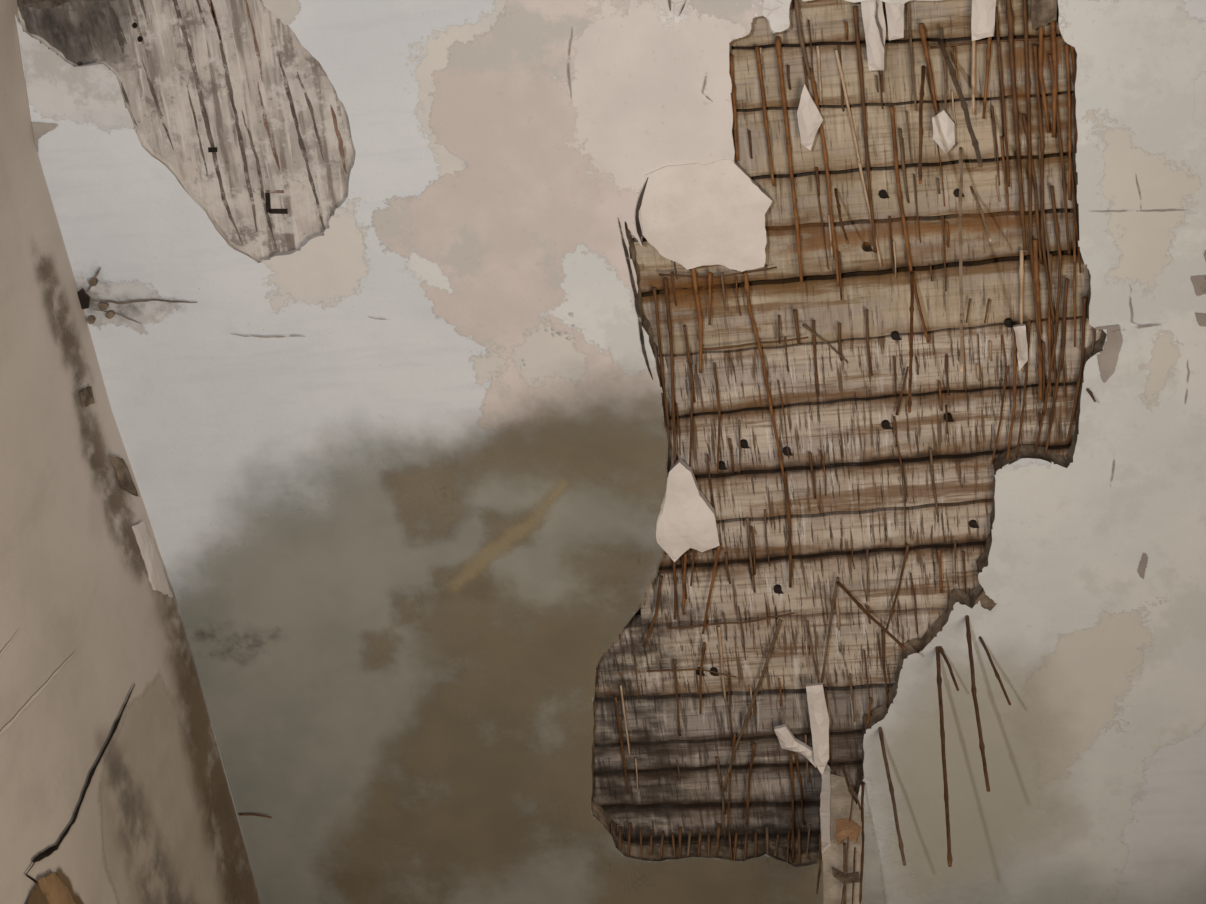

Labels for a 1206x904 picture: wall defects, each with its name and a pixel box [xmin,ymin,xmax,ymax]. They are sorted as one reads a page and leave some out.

crack [875,0,885,49]
spalling [16,0,371,314]
peeling [79,386,95,407]
peeling [109,457,138,496]
peeling [75,276,180,335]
peeling [132,521,173,597]
leakage [168,398,824,904]
peeling [367,0,1206,904]
crack [26,684,135,904]
peeling [100,675,237,904]